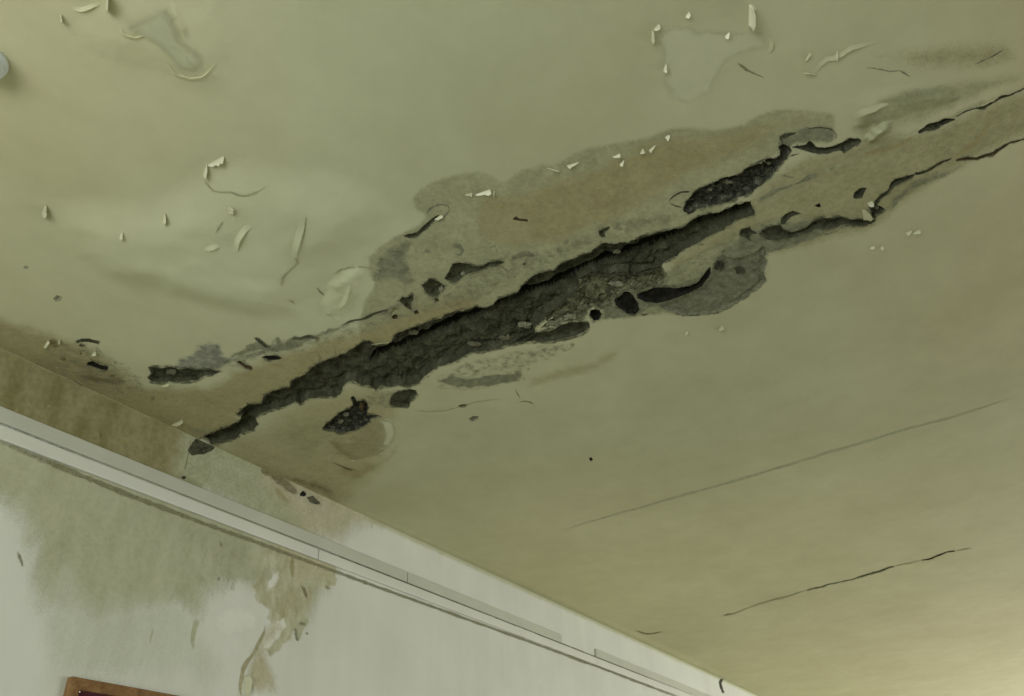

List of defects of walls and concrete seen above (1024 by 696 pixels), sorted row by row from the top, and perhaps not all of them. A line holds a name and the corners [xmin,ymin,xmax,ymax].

crack [915,139,1024,175]
crack [918,88,1024,134]
leakage [0,35,1024,532]
spalling [188,138,914,456]
spalling [147,364,222,388]
crack [566,395,1021,529]
leakage [0,440,341,696]
crack [724,547,971,616]